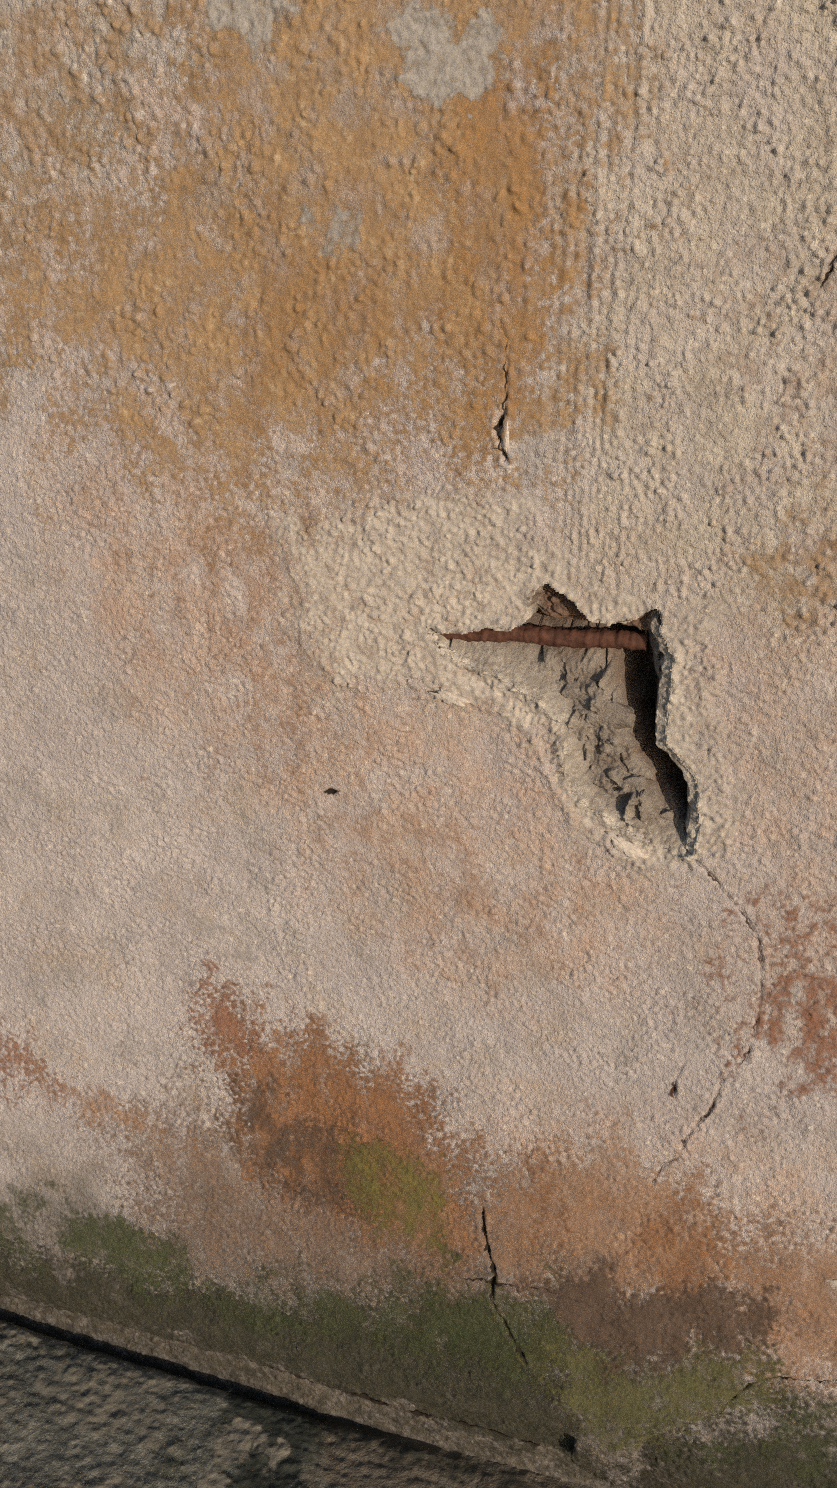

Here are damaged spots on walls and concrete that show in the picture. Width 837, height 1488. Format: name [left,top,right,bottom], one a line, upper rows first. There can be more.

crack [810,255,837,315]
peeling [270,484,742,880]
crack [652,860,762,1188]
water stain [90,1080,826,1382]
crack [460,1202,572,1363]
crack [719,1376,837,1414]